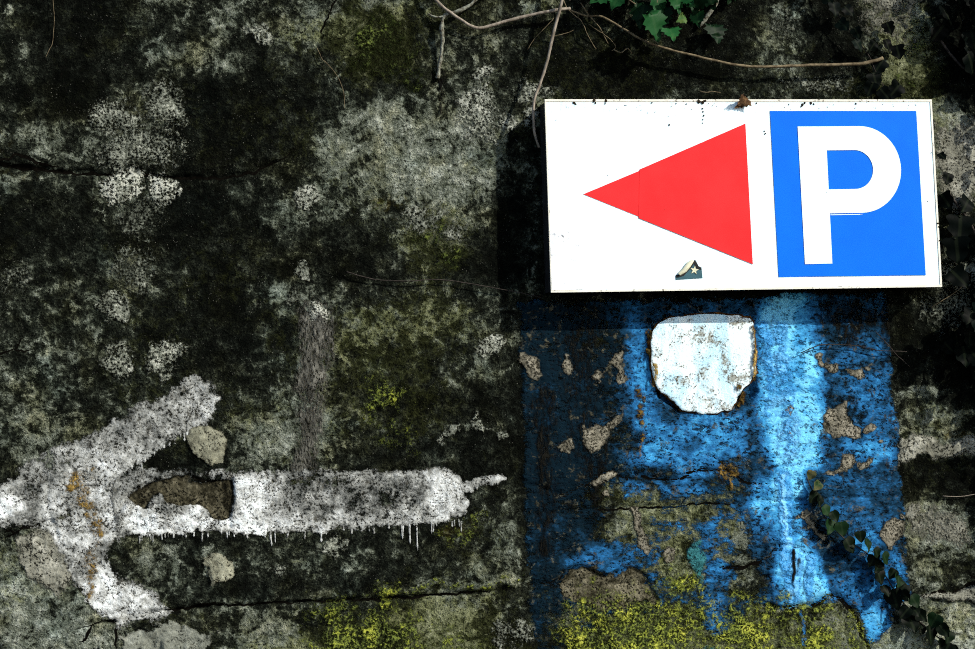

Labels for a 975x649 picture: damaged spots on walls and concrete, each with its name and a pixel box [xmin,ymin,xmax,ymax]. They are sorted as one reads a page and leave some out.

crack [0,148,298,181]
spalling [518,352,543,381]
spalling [557,413,624,454]
spalling [823,400,884,443]
spalling [824,453,874,476]
peeling [879,502,972,550]
crack [158,566,625,612]
spalling [559,565,661,612]
crack [72,620,118,648]